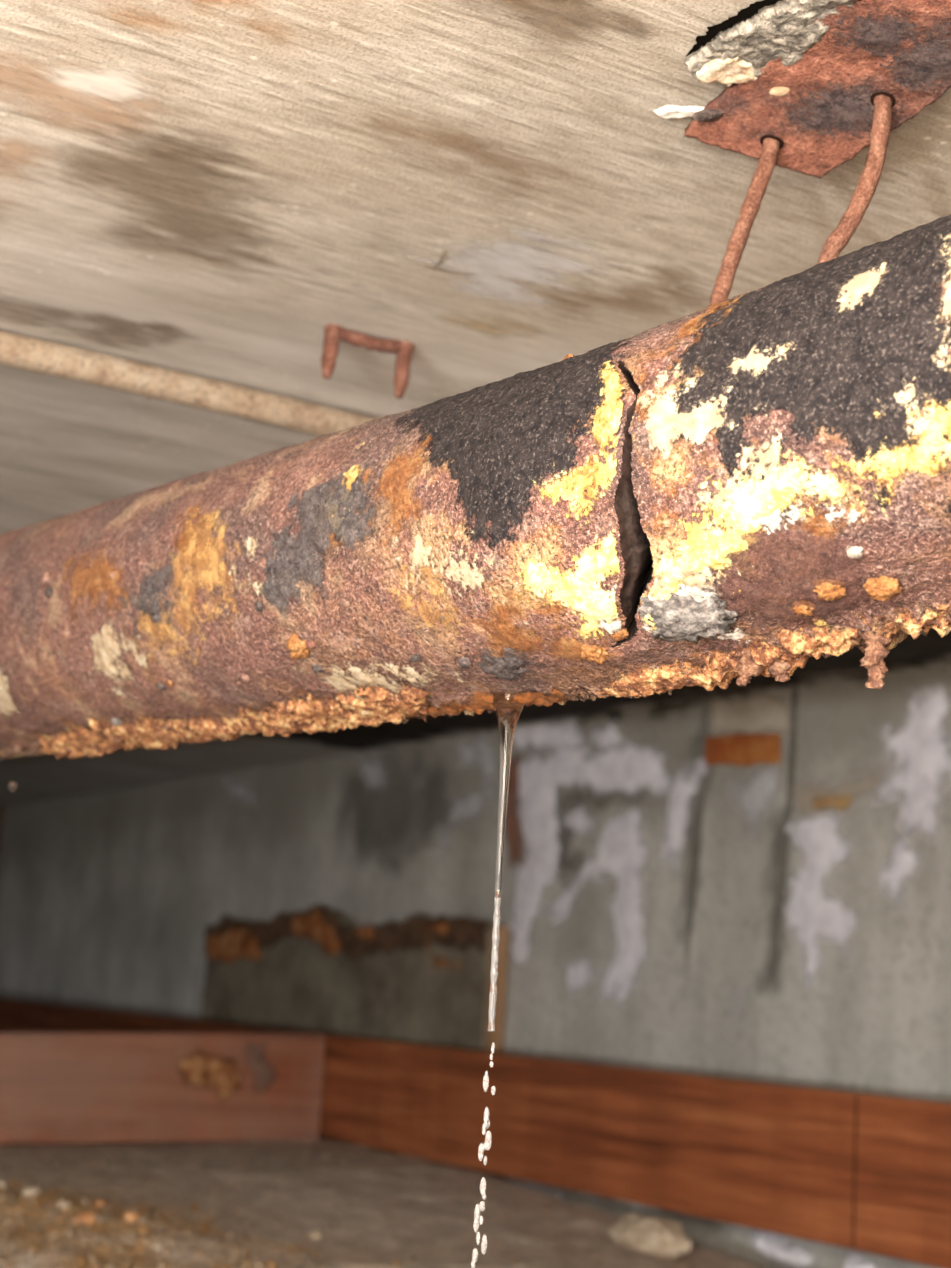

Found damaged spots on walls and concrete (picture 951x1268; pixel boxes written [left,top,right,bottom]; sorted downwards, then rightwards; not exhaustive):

spalling [652,105,704,120]
spalling [685,0,857,87]
peeling [769,87,790,96]
rust [626,294,744,421]
rust [363,435,431,546]
crack [611,360,654,648]
rust [0,588,951,760]
leakage [884,628,951,671]
leakage [247,710,499,850]
leakage [509,646,869,1003]
efflorescence [877,684,951,902]
spalling [204,904,486,965]